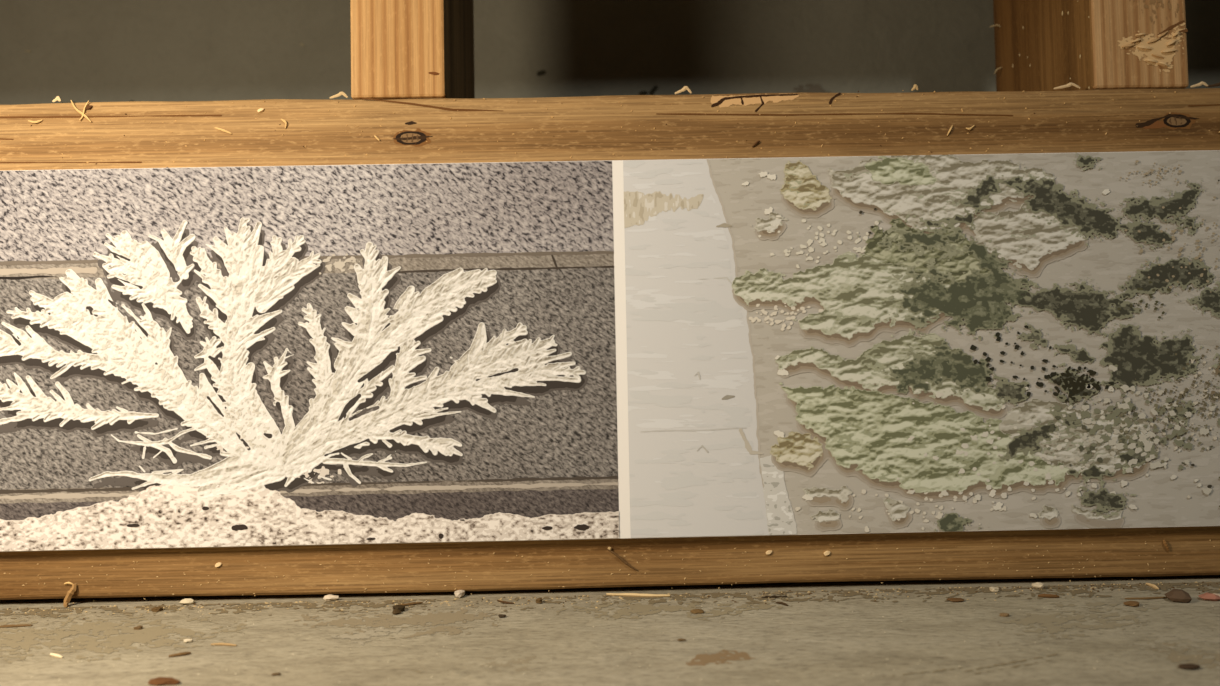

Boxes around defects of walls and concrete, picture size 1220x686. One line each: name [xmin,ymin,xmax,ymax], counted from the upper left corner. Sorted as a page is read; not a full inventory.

leakage [0,217,586,498]
flaking render [623,151,1220,538]
leakage [732,155,1220,523]